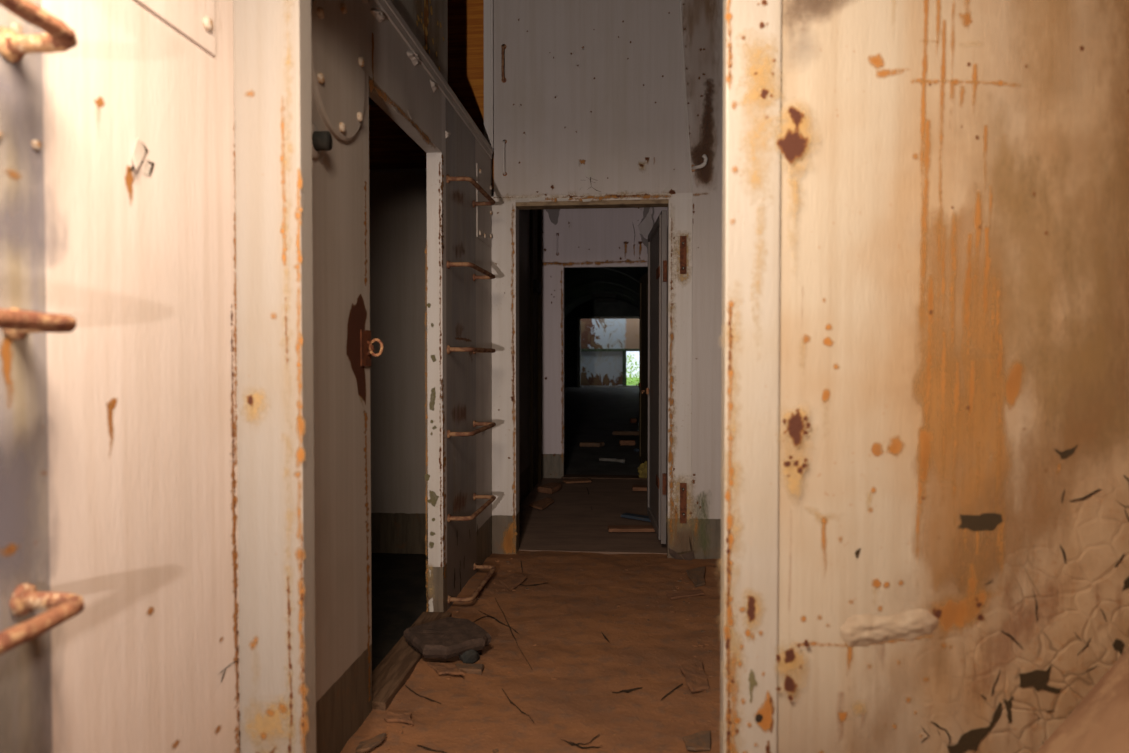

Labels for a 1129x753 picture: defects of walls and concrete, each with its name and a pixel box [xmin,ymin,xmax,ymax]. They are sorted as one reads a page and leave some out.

corrosion [725,0,745,86]
corrosion [750,105,812,188]
corrosion [0,336,12,391]
corrosion [912,0,1098,648]
corrosion [220,121,308,753]
corrosion [871,437,903,456]
corrosion [724,301,811,753]
spalling [957,513,1003,555]
crack [1061,475,1129,521]
crack [1001,630,1023,650]
crack [1074,609,1107,672]
spalling [930,665,1061,753]